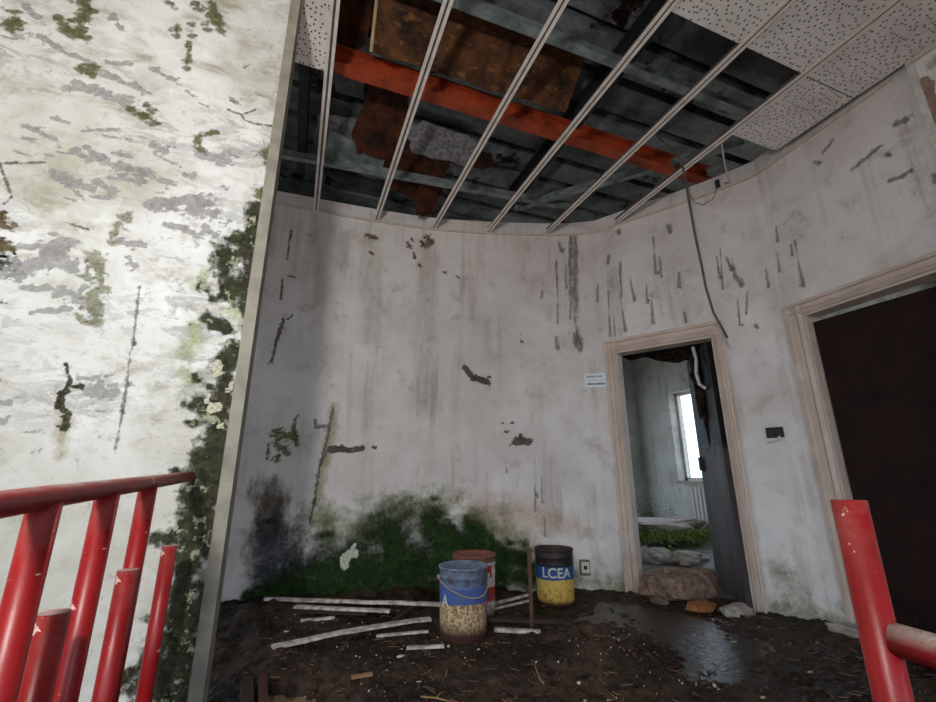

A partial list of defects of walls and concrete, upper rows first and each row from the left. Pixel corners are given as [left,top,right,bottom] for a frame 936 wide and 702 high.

peeling [21,3,151,109]
peeling [148,66,209,108]
peeling [920,76,936,124]
peeling [21,124,239,239]
peeling [0,231,90,315]
peeling [114,237,147,271]
damp [267,314,293,364]
spalling [461,364,492,387]
damp [248,478,305,588]